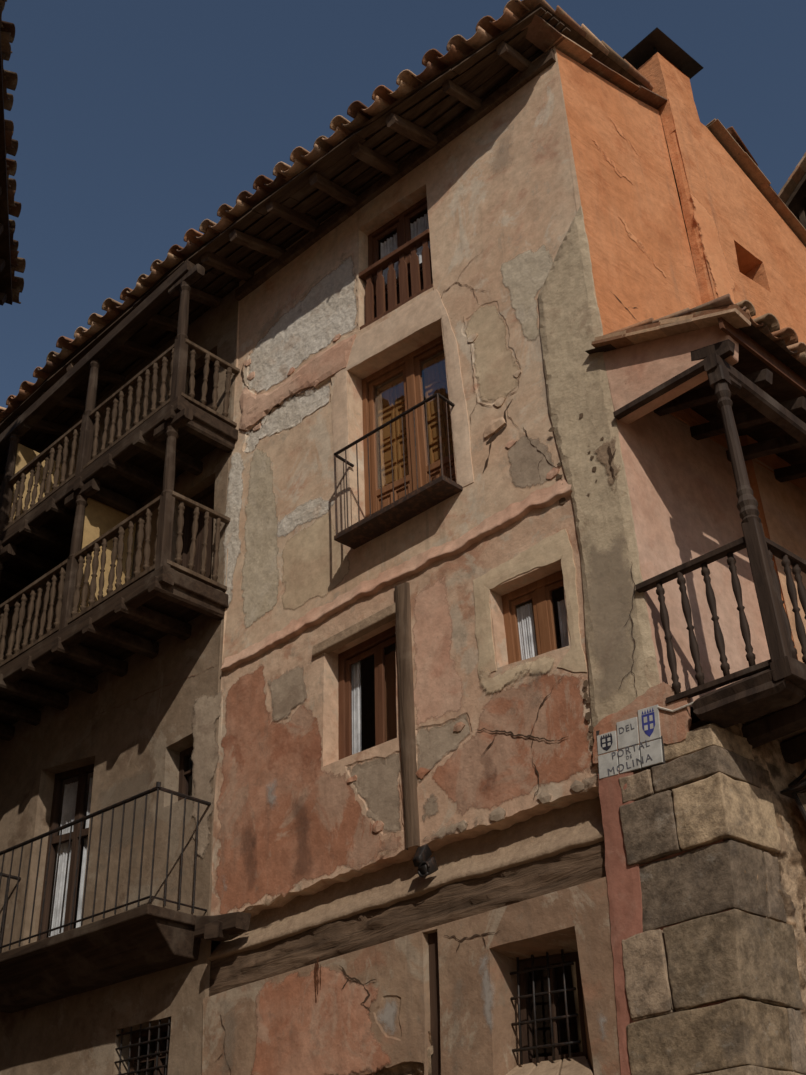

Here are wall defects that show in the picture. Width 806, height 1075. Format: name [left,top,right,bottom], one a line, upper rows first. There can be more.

peeling [223,380,334,604]
peeling [245,256,358,393]
crack [432,254,562,480]
peeling [505,427,566,504]
peeling [191,665,402,914]
peeling [413,577,598,839]
crack [478,675,568,797]
crack [339,965,376,1011]